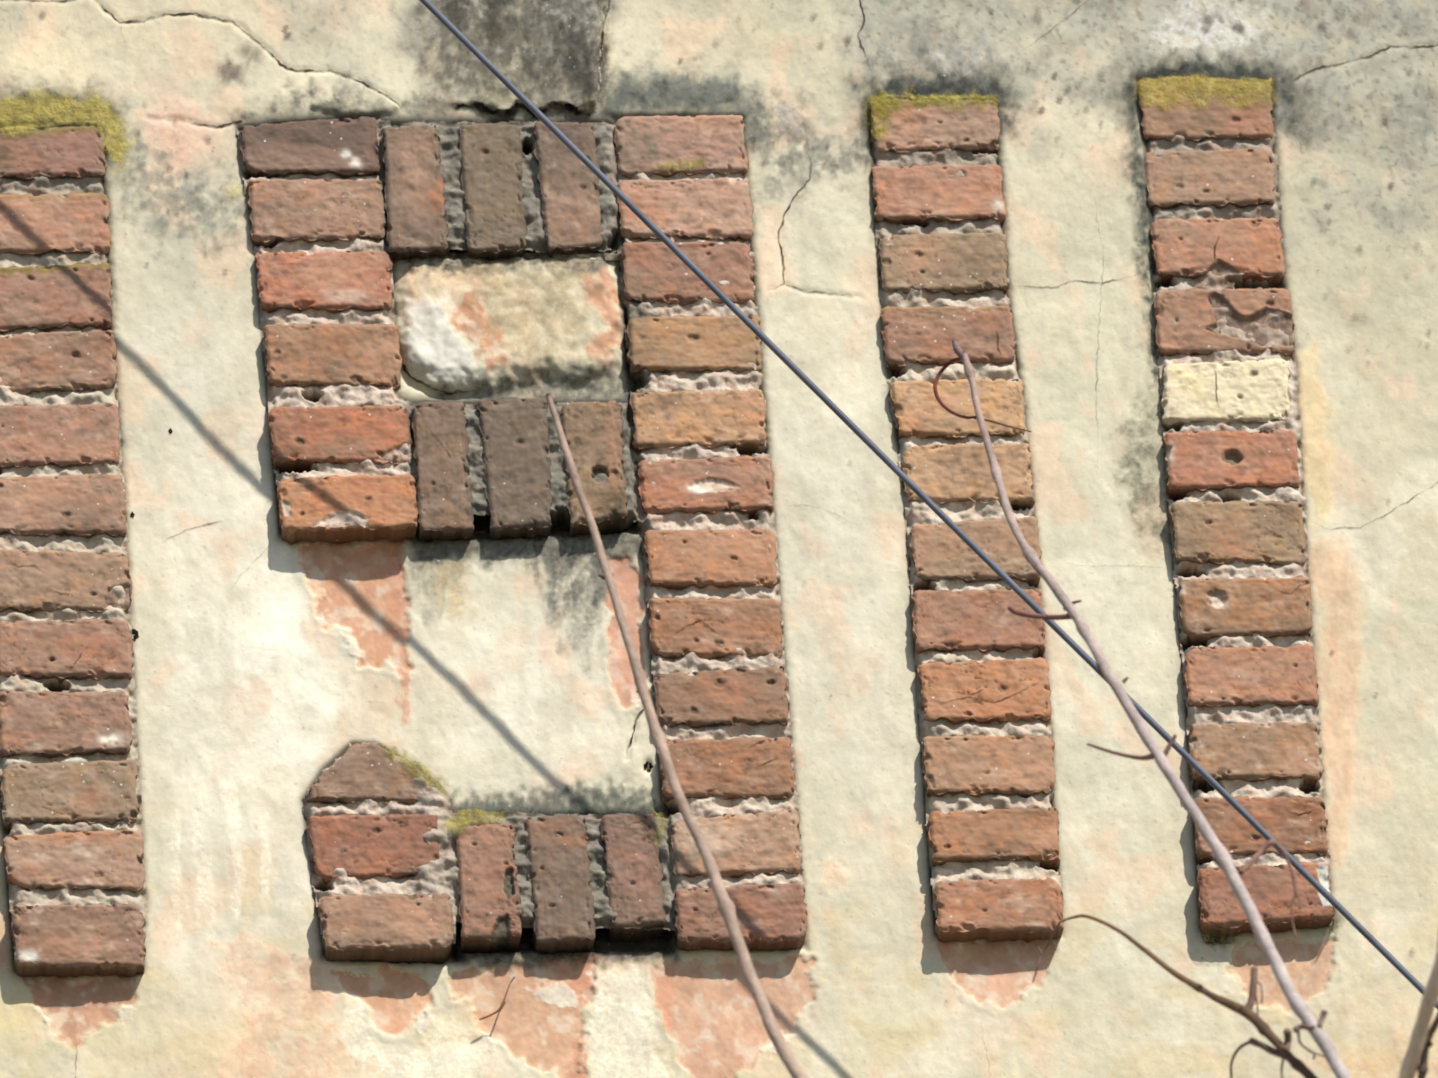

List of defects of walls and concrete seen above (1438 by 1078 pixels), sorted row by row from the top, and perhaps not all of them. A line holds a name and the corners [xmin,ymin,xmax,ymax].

crack [16,0,403,110]
leakage [415,0,610,122]
crack [857,0,867,59]
crack [1294,44,1438,80]
crack [188,120,243,128]
crack [776,176,847,296]
flaking render [289,540,412,724]
flaking render [23,975,137,1049]
flaking render [448,959,599,1078]
flaking render [651,955,817,1078]
flaking render [938,940,1056,1007]
flaking render [1227,939,1335,1013]